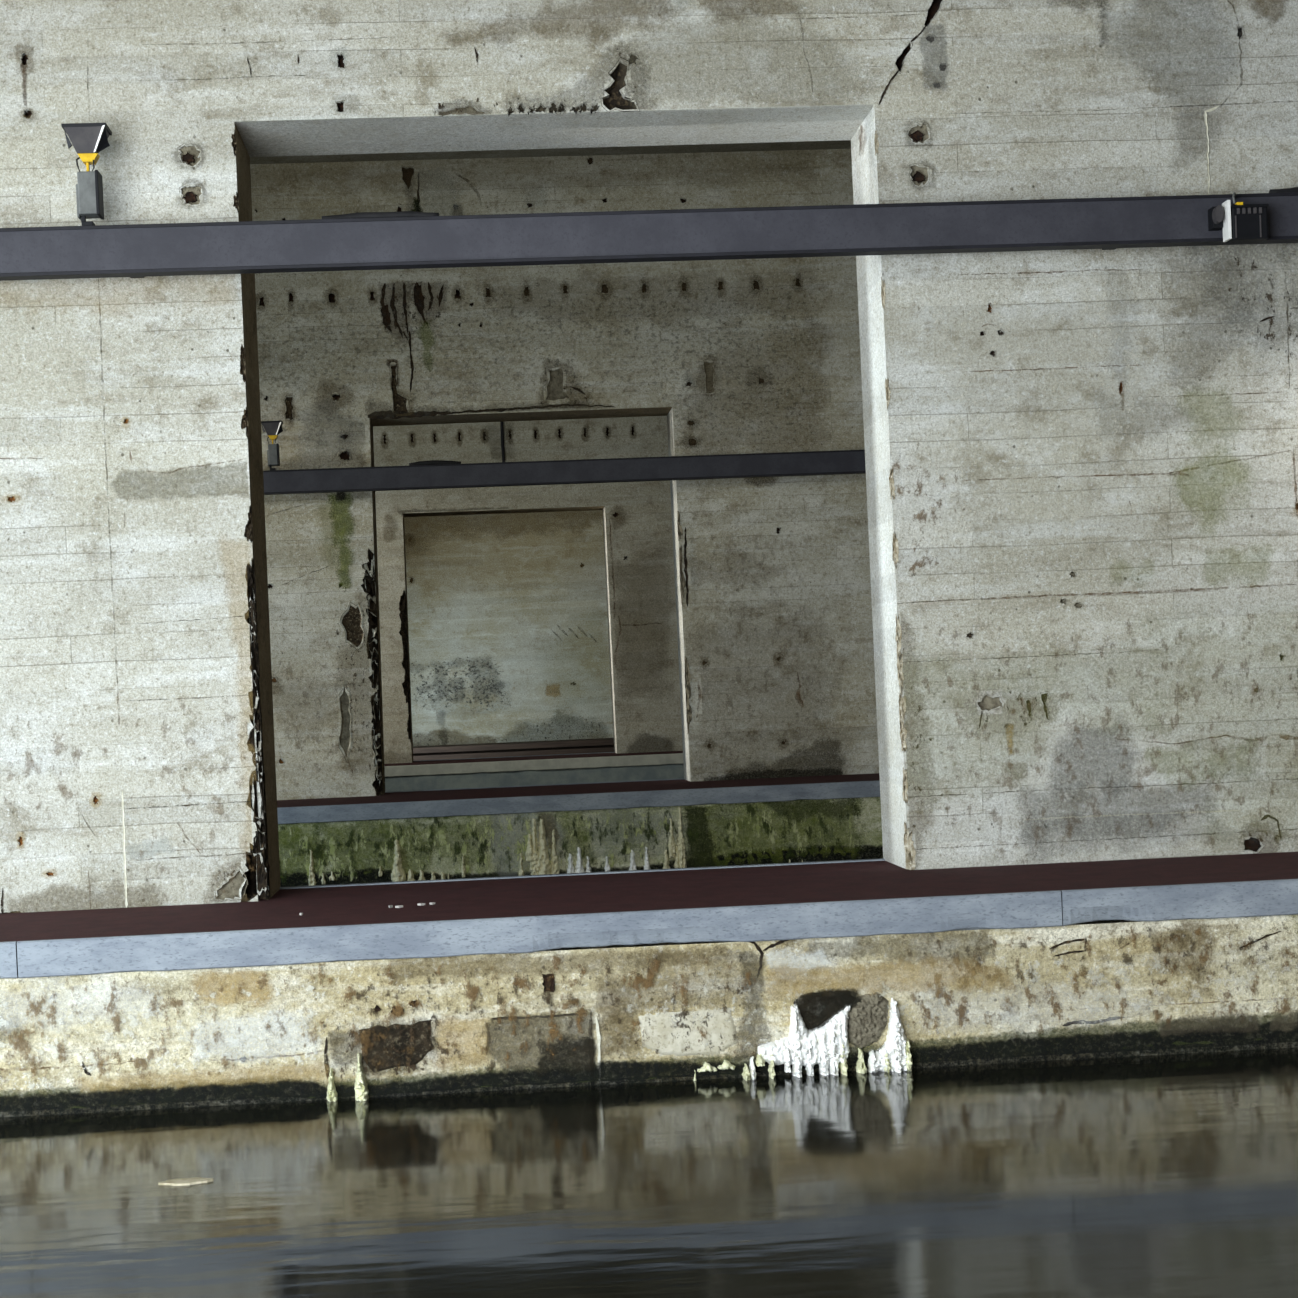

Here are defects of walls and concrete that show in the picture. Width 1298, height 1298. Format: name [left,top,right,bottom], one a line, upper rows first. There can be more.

spalling [435,49,640,117]
crack [878,0,943,106]
spalling [241,408,249,438]
spalling [244,506,254,542]
damp [328,494,354,589]
spalling [336,548,383,796]
spalling [213,558,273,902]
damp [0,968,332,1089]
damp [326,1068,338,1102]
spalling [321,1000,434,1080]
spalling [485,1012,595,1074]
damp [343,935,1127,1101]